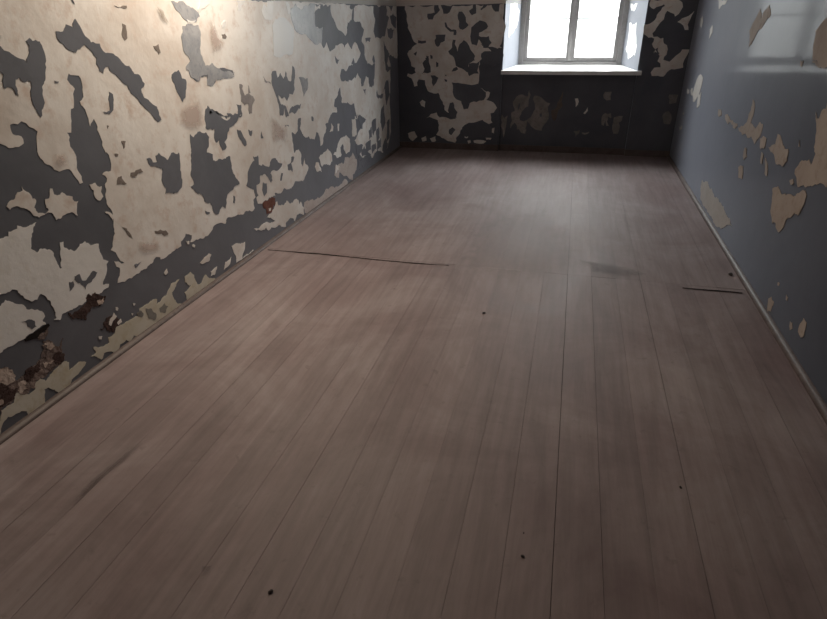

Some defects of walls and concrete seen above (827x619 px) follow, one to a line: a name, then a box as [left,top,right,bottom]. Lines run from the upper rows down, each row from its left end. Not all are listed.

peeling [626,0,713,77]
peeling [749,5,771,46]
peeling [800,18,827,69]
peeling [687,74,703,108]
peeling [0,0,550,353]
peeling [718,100,800,179]
peeling [770,105,827,232]
flaking render [0,242,253,434]